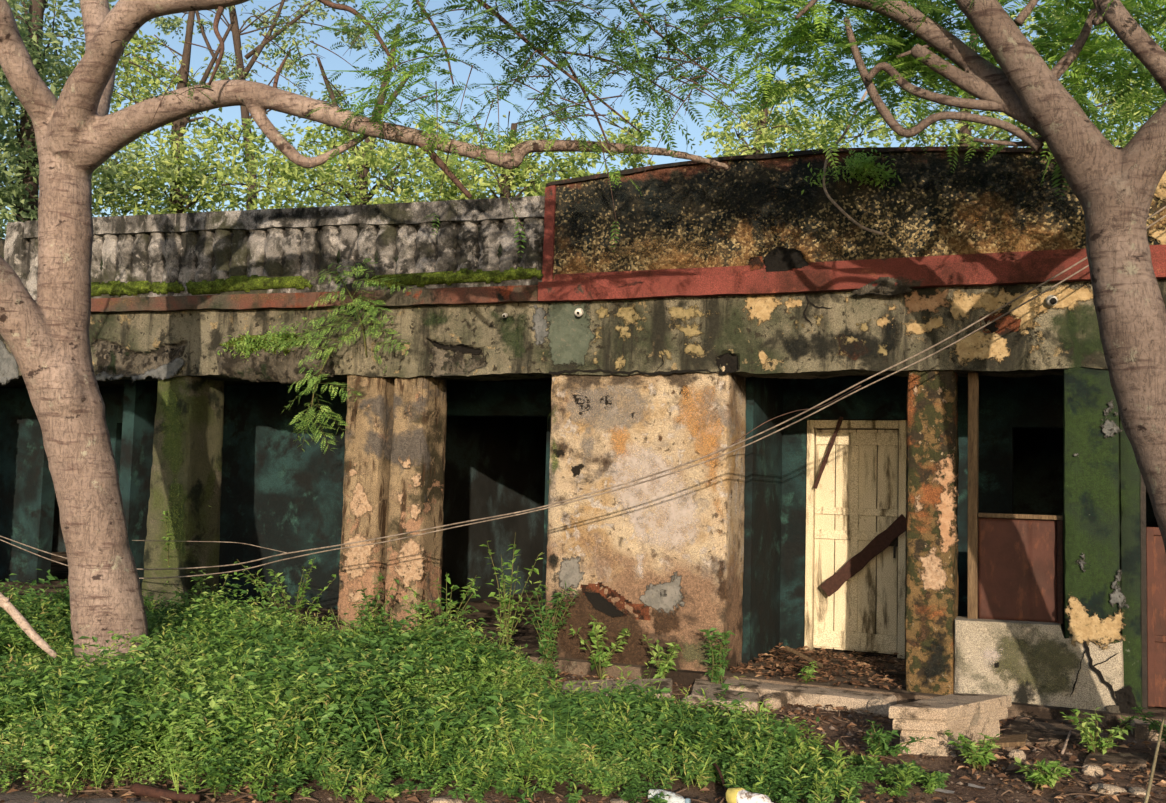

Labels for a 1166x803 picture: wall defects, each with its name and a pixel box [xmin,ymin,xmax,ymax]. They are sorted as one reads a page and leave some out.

leakage [652,180,818,248]
leakage [916,171,1073,234]
peeling [742,295,823,330]
peeling [835,277,1093,367]
flaking render [0,340,19,385]
peeling [914,451,959,592]
peeling [392,535,426,591]
flaking render [556,555,651,620]
corrosion [978,518,1057,623]
flaking render [1065,569,1129,650]
mould [989,635,1081,704]
crack [1065,618,1123,713]